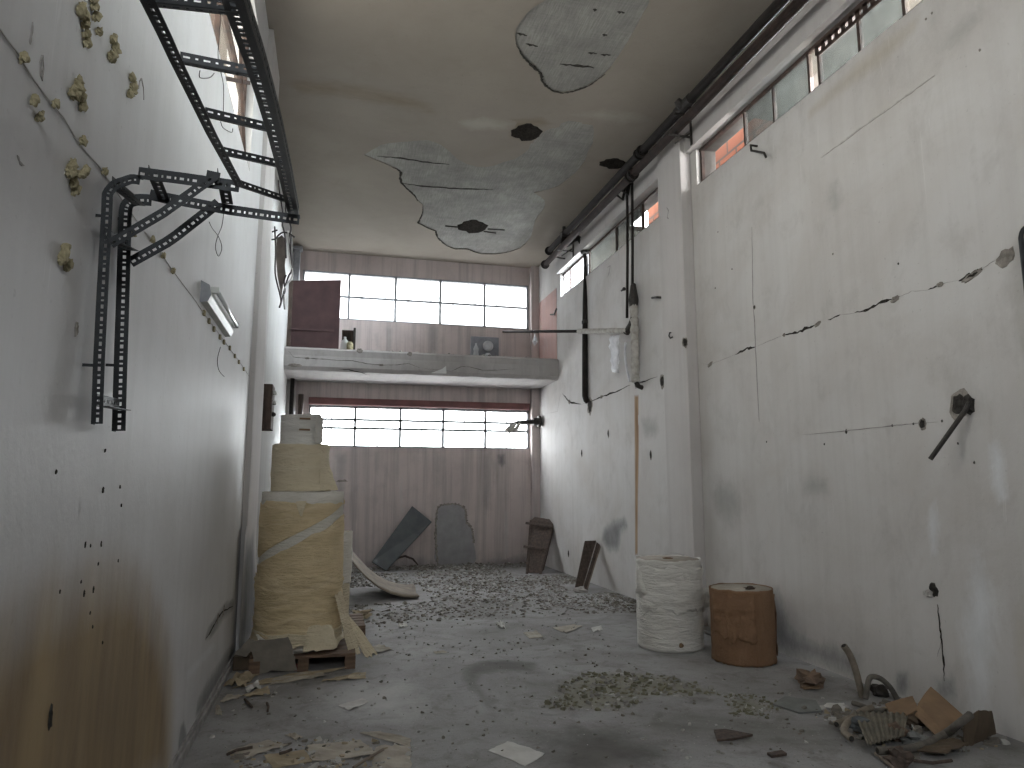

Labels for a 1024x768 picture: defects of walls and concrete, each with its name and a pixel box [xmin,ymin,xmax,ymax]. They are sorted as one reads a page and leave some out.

spalling [365,121,594,254]
crack [707,246,1015,413]
crack [552,377,655,413]
crack [804,422,932,435]
crack [937,604,945,674]